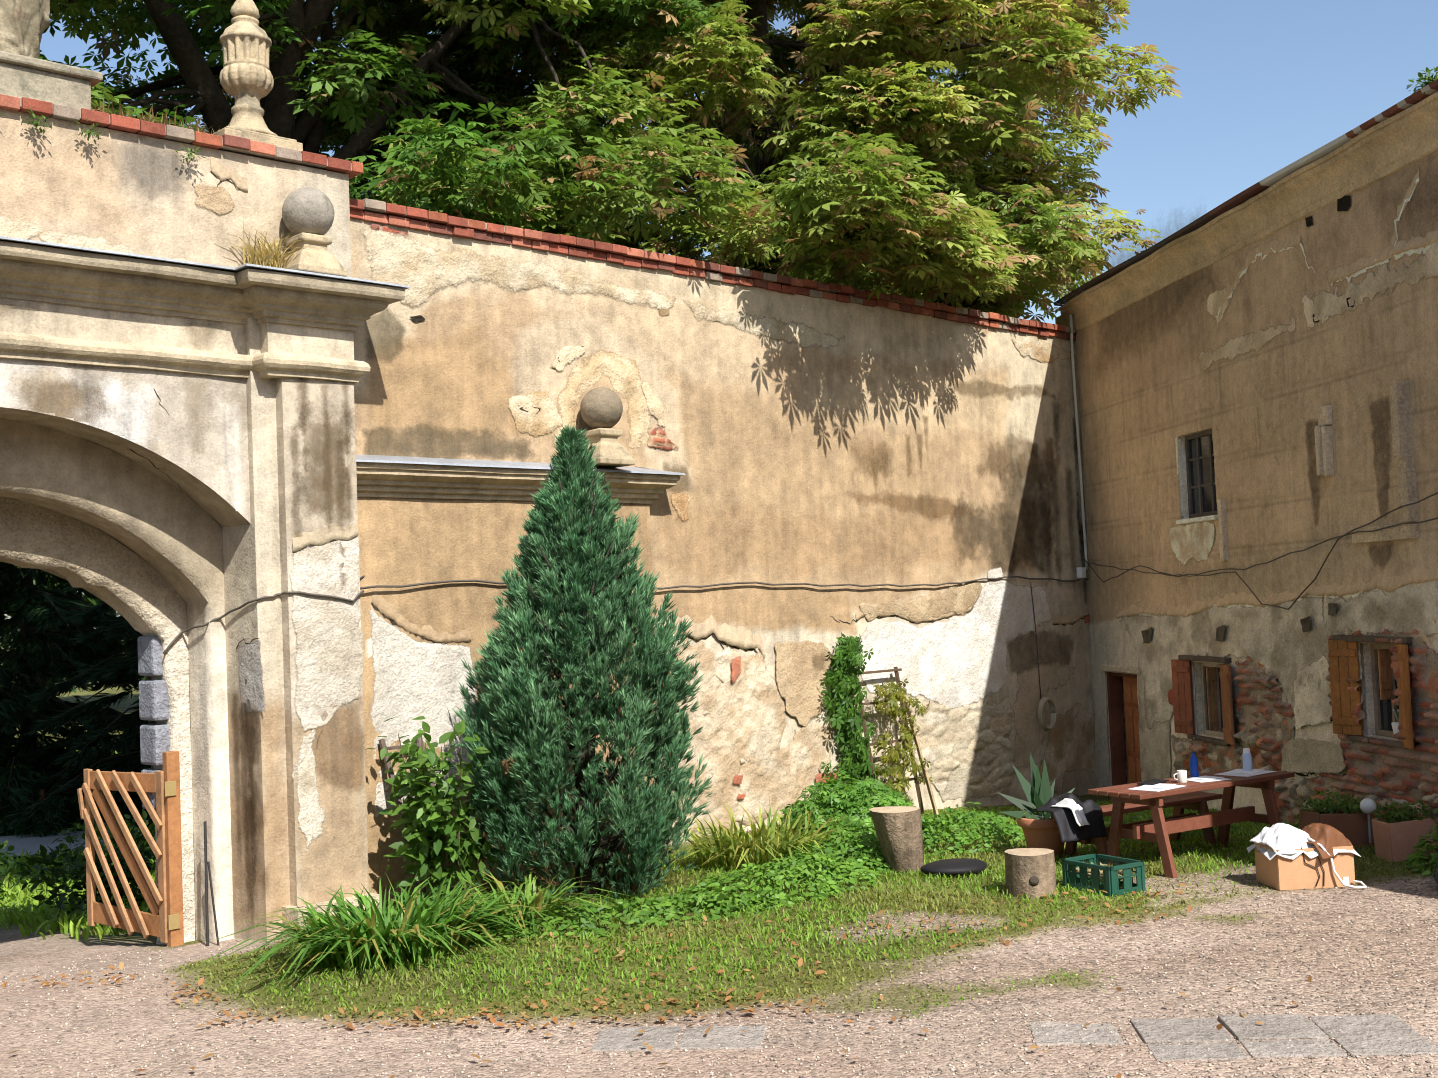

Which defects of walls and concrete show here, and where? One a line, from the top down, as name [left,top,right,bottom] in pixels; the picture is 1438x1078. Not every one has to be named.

flaking render [363,223,839,348]
flaking render [1199,169,1438,371]
damp [292,396,350,516]
flaking render [508,390,563,437]
flaking render [647,427,679,450]
flaking render [289,523,477,853]
flaking render [664,634,838,836]
flaking render [1116,567,1438,826]